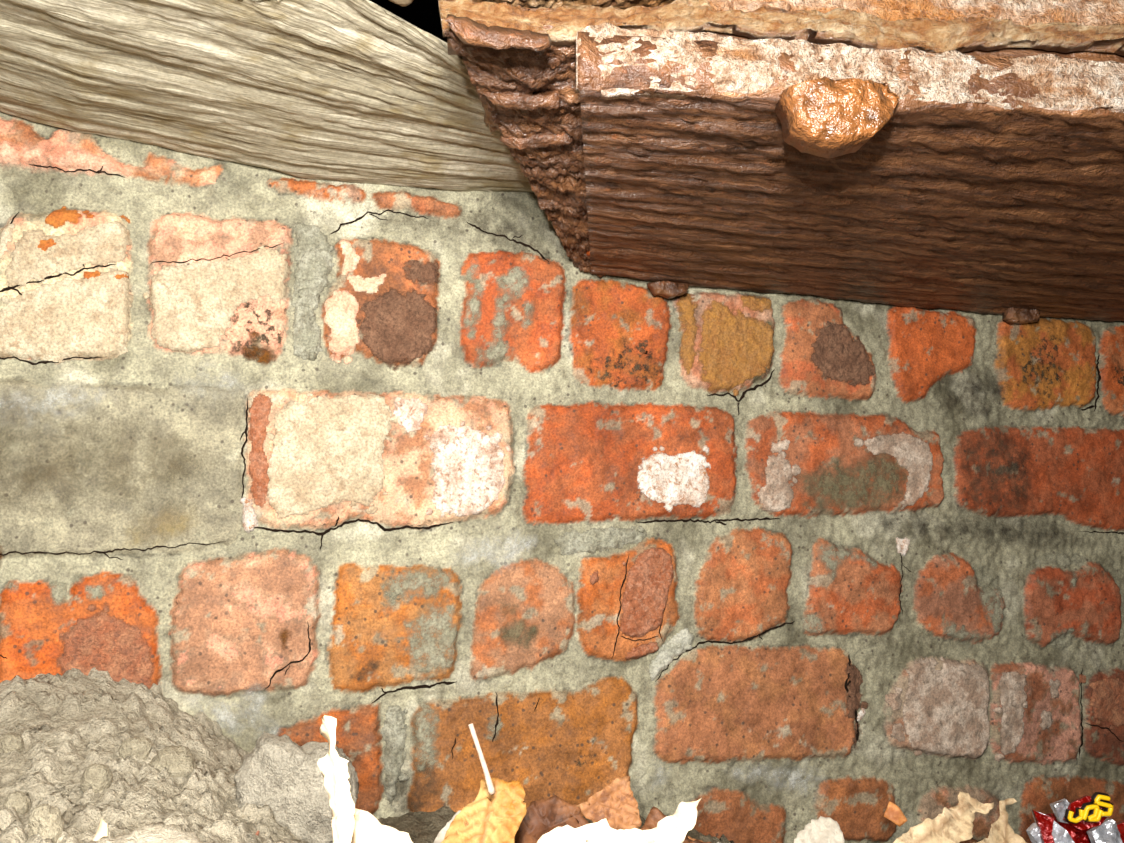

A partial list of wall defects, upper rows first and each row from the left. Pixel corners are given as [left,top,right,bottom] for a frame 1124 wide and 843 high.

rust [445,14,552,51]
rust [483,90,560,111]
rust [500,132,573,150]
crack [0,264,115,295]
rust [647,281,689,299]
rust [1002,307,1040,324]
crack [240,398,249,498]
crack [254,516,453,550]
crack [0,541,226,560]
crack [611,556,795,682]
crack [265,621,311,689]